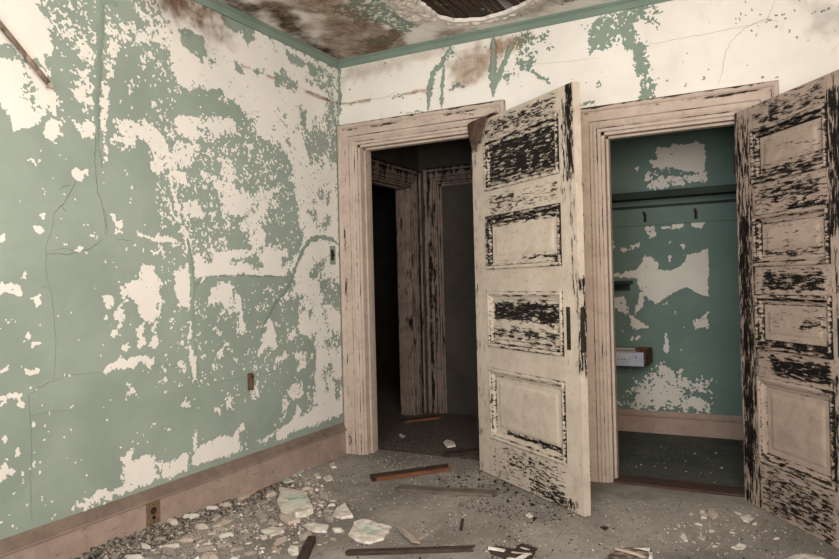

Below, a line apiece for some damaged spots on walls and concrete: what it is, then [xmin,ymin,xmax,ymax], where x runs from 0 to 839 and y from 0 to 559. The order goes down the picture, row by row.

water stain [169,0,213,24]
water stain [225,0,404,59]
peeling [331,0,438,47]
water stain [462,39,517,82]
peeling [503,30,554,87]
crack [28,0,132,518]
peeling [0,0,352,512]
peeling [645,222,705,239]
crack [156,235,340,383]
peeling [614,241,710,341]
peeling [617,333,717,414]